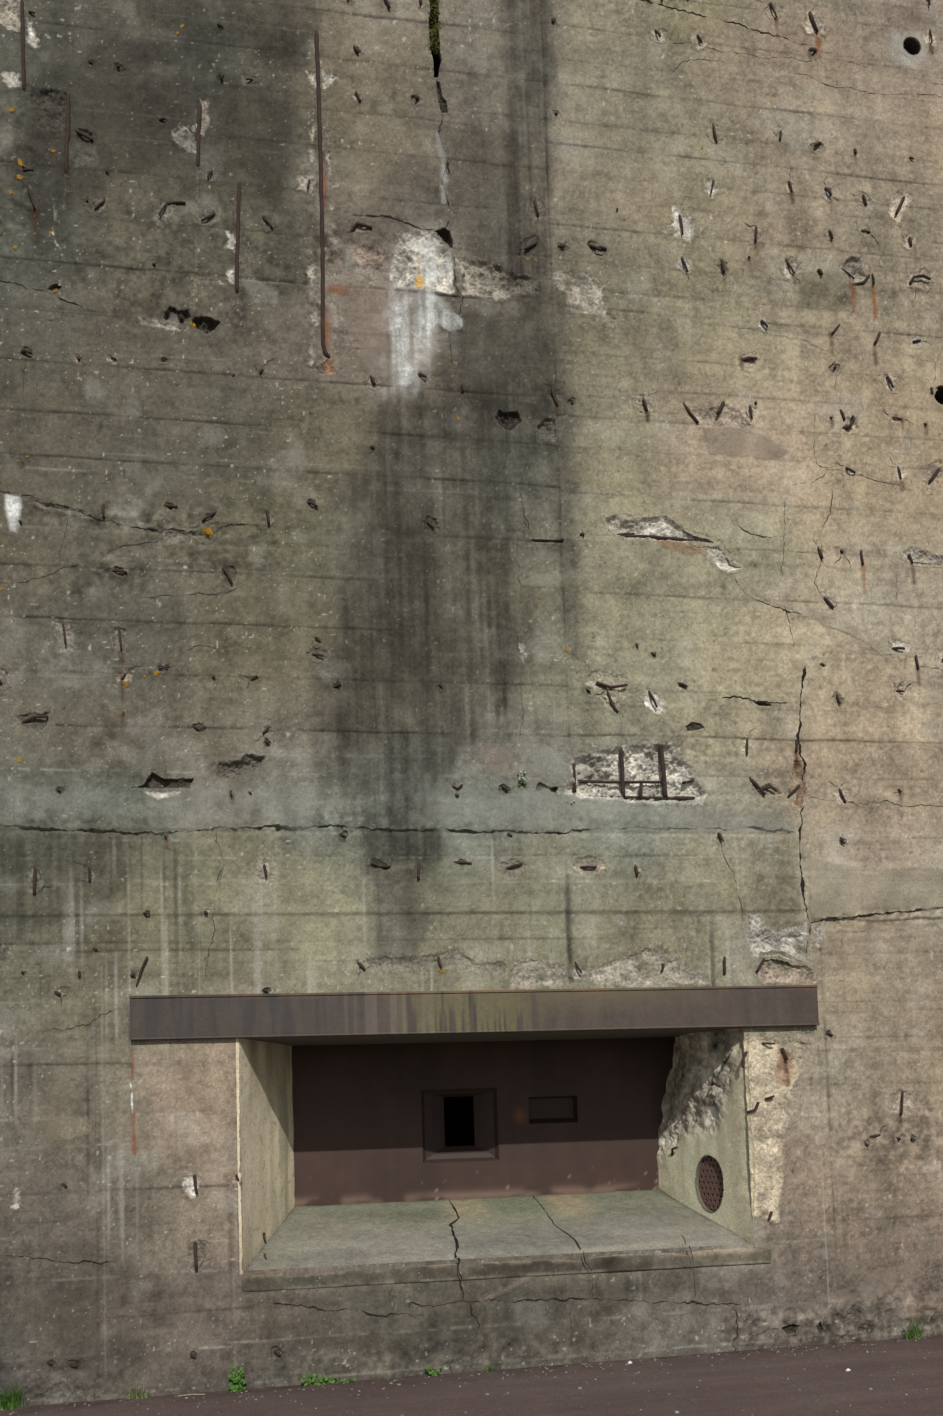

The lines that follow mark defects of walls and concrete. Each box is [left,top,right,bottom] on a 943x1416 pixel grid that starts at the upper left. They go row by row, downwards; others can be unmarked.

crack [426,0,445,80]
crack [642,0,940,97]
spalling [293,30,624,368]
spalling [44,280,66,294]
crack [0,280,136,397]
leakage [385,239,449,384]
spalling [600,510,745,575]
crack [0,409,943,977]
spalling [533,719,710,808]
spalling [351,939,715,990]
spalling [743,1026,836,1225]
crack [273,1196,777,1373]